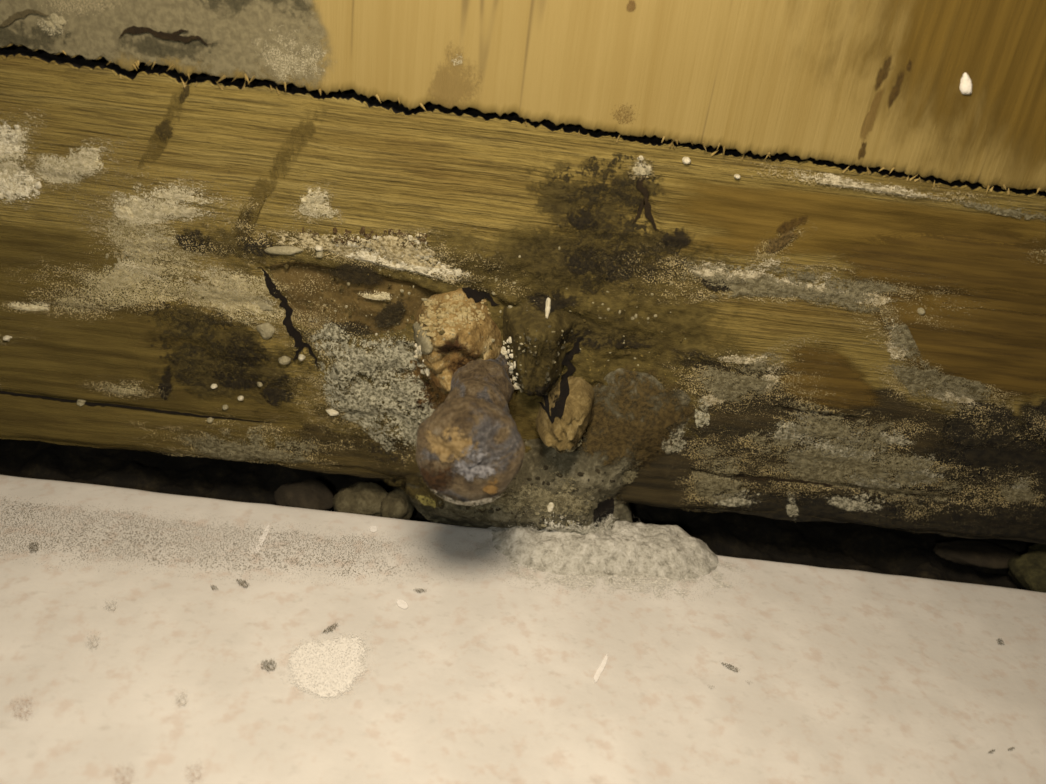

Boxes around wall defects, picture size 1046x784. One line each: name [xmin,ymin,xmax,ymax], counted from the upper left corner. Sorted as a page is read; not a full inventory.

damp [0,0,332,83]
crack [0,9,1046,233]
crack [258,267,319,371]
damp [0,85,1046,544]
rust [405,358,449,414]
crack [535,336,584,424]
damp [0,497,470,590]